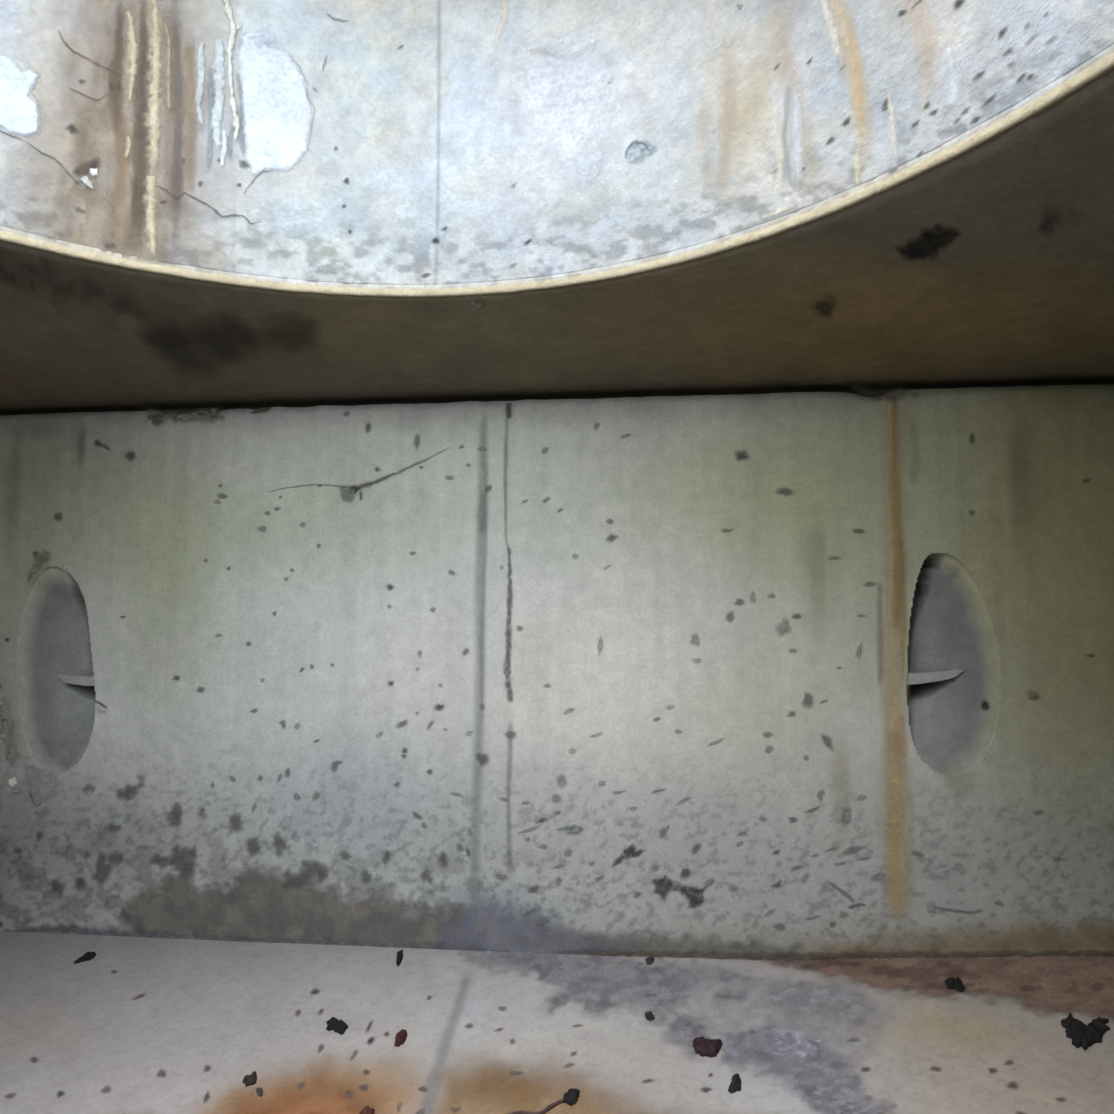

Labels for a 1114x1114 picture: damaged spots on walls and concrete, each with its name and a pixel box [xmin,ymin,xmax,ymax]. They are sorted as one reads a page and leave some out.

peeling [0,56,41,135]
rust [70,0,193,262]
peeling [240,31,314,174]
crack [274,449,446,502]
leakage [118,462,793,958]
leakage [53,852,123,893]
rust [225,1075,404,1114]